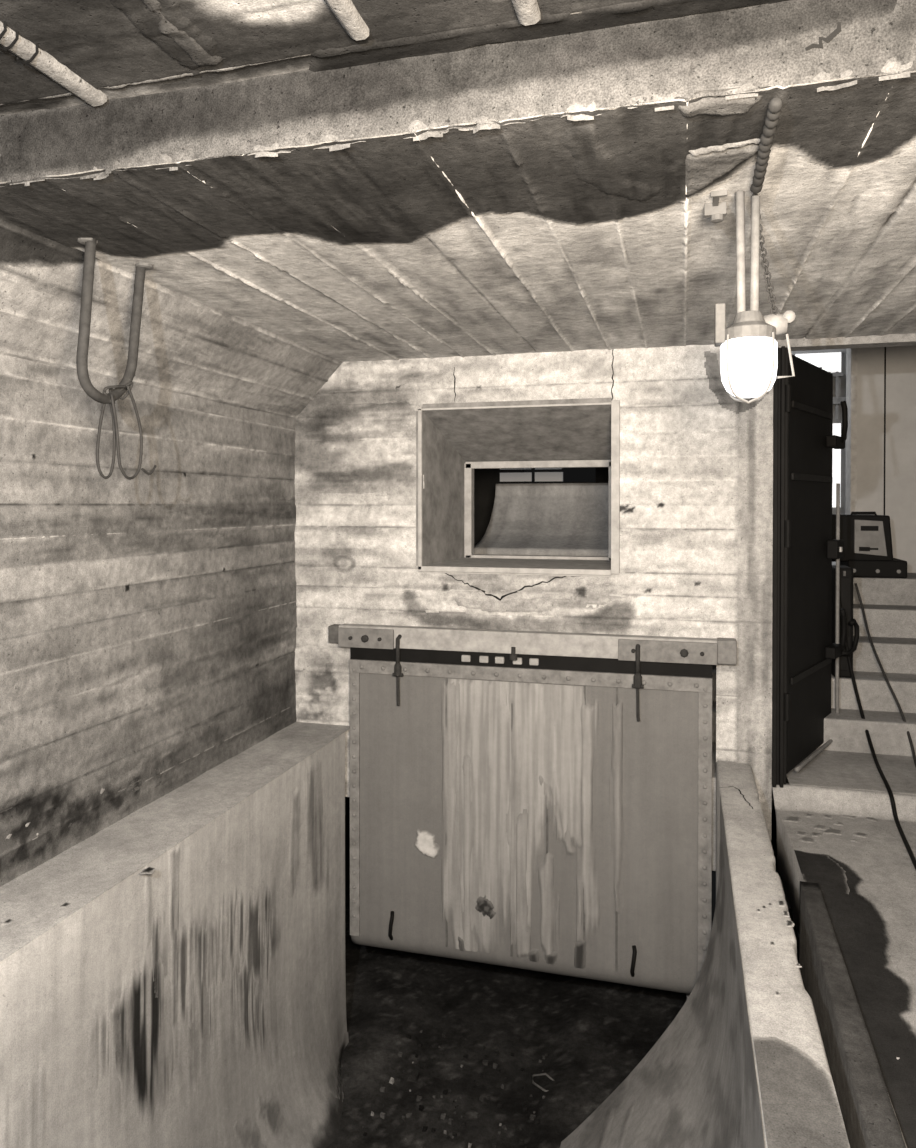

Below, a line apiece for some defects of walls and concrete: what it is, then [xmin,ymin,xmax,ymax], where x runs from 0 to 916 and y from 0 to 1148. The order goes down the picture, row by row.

damp [0,577,297,881]
damp [88,883,281,1129]
damp [306,1029,349,1148]